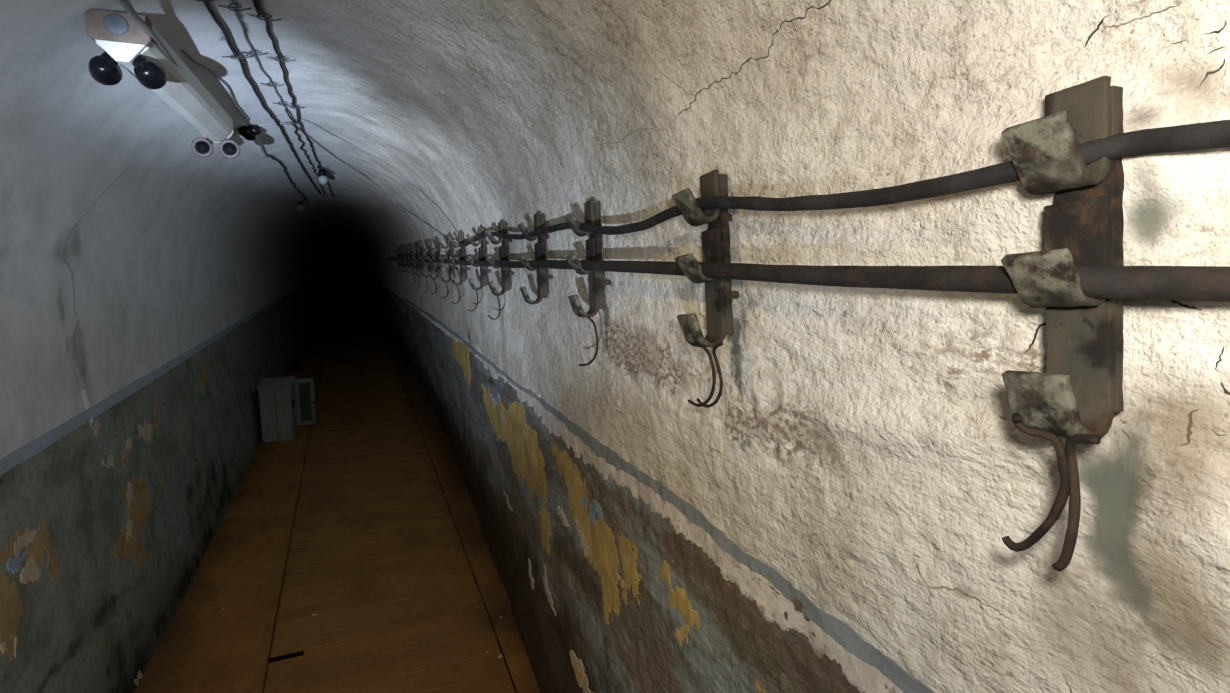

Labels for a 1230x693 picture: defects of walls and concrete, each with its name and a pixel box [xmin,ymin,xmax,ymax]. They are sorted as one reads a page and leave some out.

crack [1085,5,1179,47]
crack [1172,21,1226,85]
crack [598,0,831,250]
peeling [102,398,160,566]
peeling [421,312,904,693]
crack [1181,410,1227,445]
crack [1215,346,1230,395]
peeling [0,520,60,663]